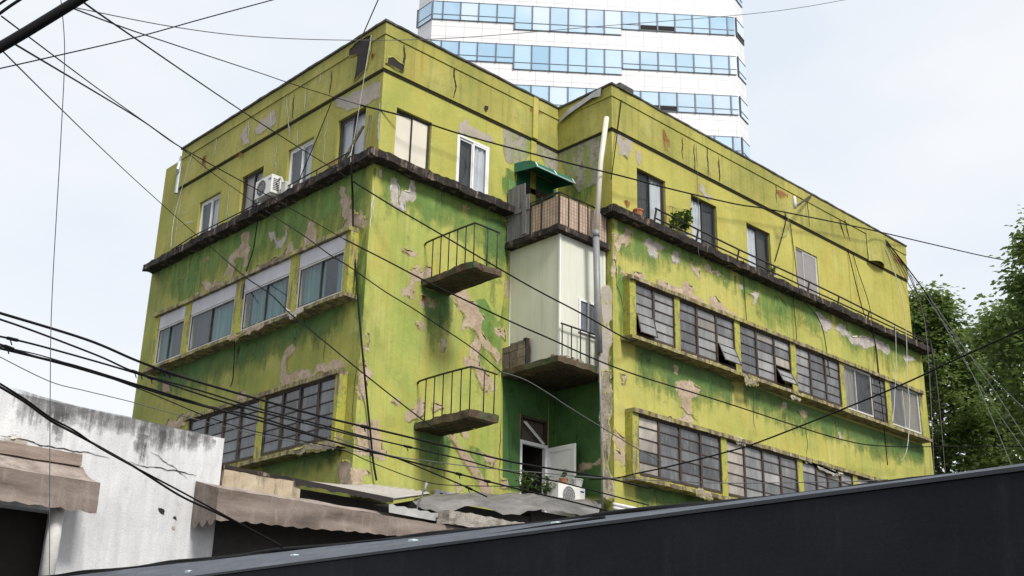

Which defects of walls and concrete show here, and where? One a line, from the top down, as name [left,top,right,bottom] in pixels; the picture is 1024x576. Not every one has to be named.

peeling [334,34,381,111]
peeling [240,110,276,145]
peeling [458,118,602,192]
peeling [339,186,367,229]
peeling [379,169,417,211]
peeling [195,220,318,295]
peeling [280,343,346,386]
peeling [450,289,507,394]
spalling [578,226,736,500]
peeling [816,312,890,355]
damp [21,392,215,456]
crack [4,436,197,478]